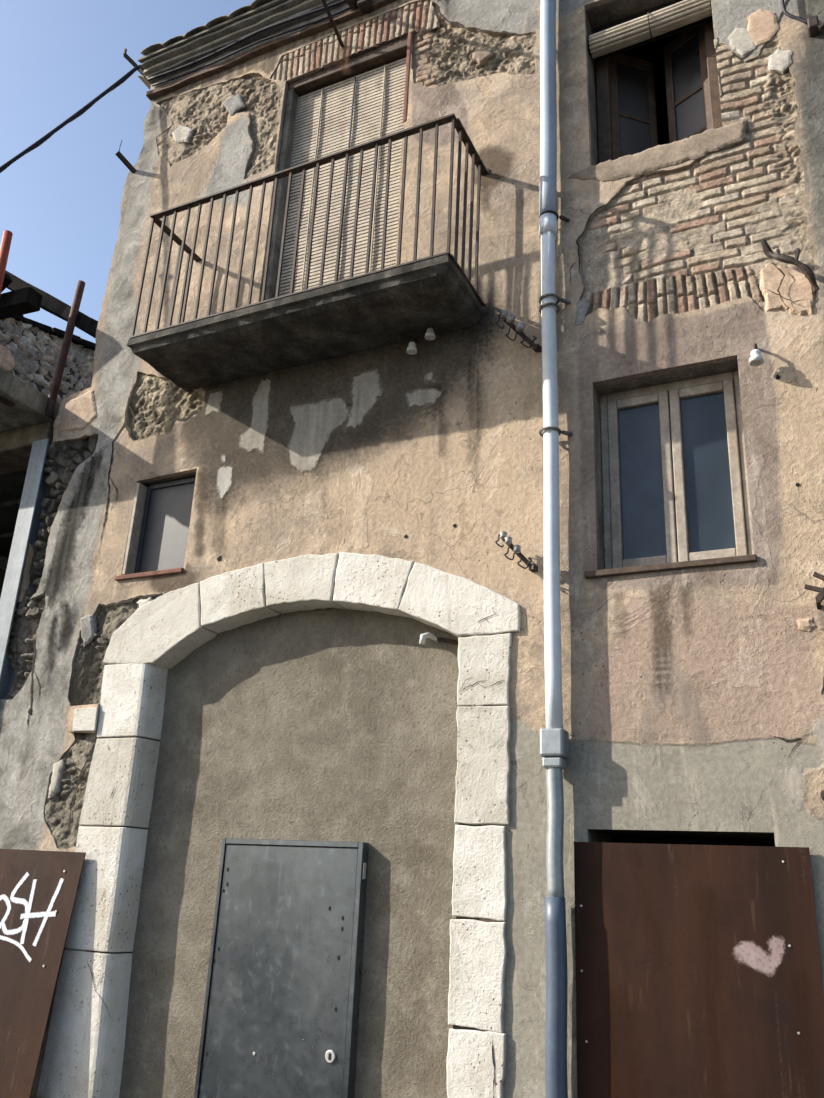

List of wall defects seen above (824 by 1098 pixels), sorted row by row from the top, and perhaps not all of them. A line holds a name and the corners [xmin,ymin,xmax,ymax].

flaking render [157,0,537,179]
flaking render [575,8,816,326]
flaking render [125,373,223,441]
peeling [239,379,271,451]
peeling [289,369,383,472]
peeling [406,371,441,406]
flaking render [72,591,168,706]
flaking render [44,733,97,849]
damp [783,766,805,808]